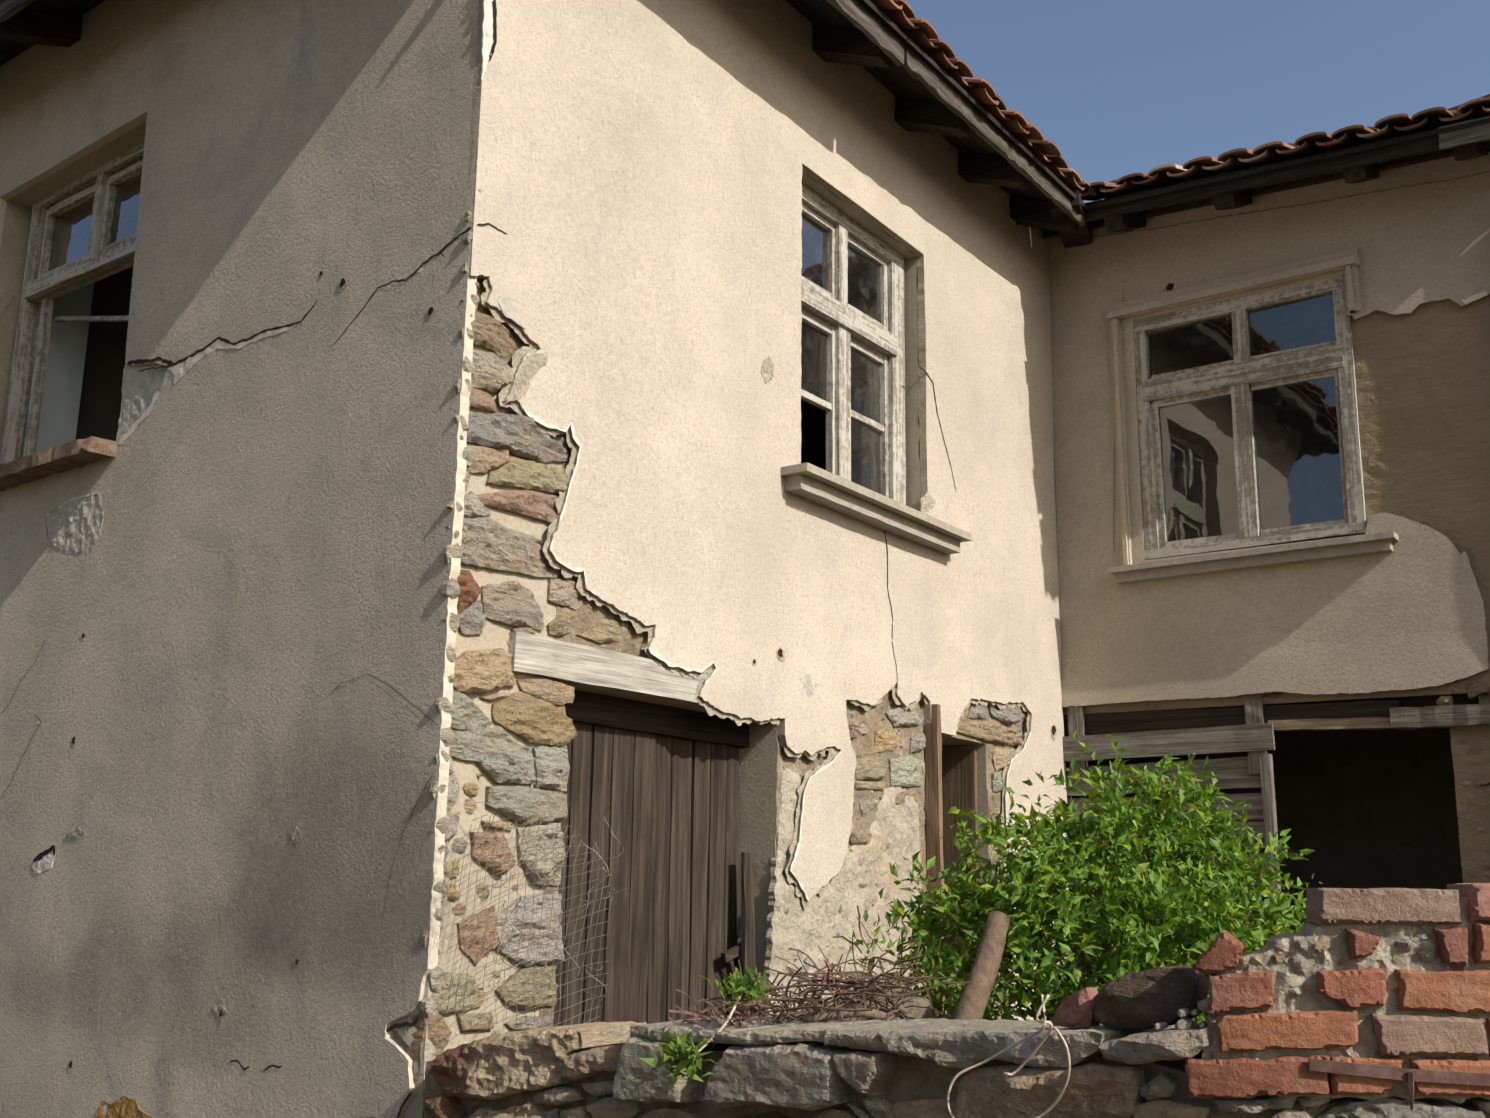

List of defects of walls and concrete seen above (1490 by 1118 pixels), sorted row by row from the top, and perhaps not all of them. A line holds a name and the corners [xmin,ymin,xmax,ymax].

crack [127,301,317,385]
crack [330,223,507,348]
peeling [1461,291,1488,305]
crack [0,642,45,799]
flaking render [407,210,780,1080]
flaking render [762,686,928,1017]
crack [884,531,898,686]
flaking render [956,699,1031,882]
flaking render [96,1096,152,1118]
crack [366,1092,412,1118]